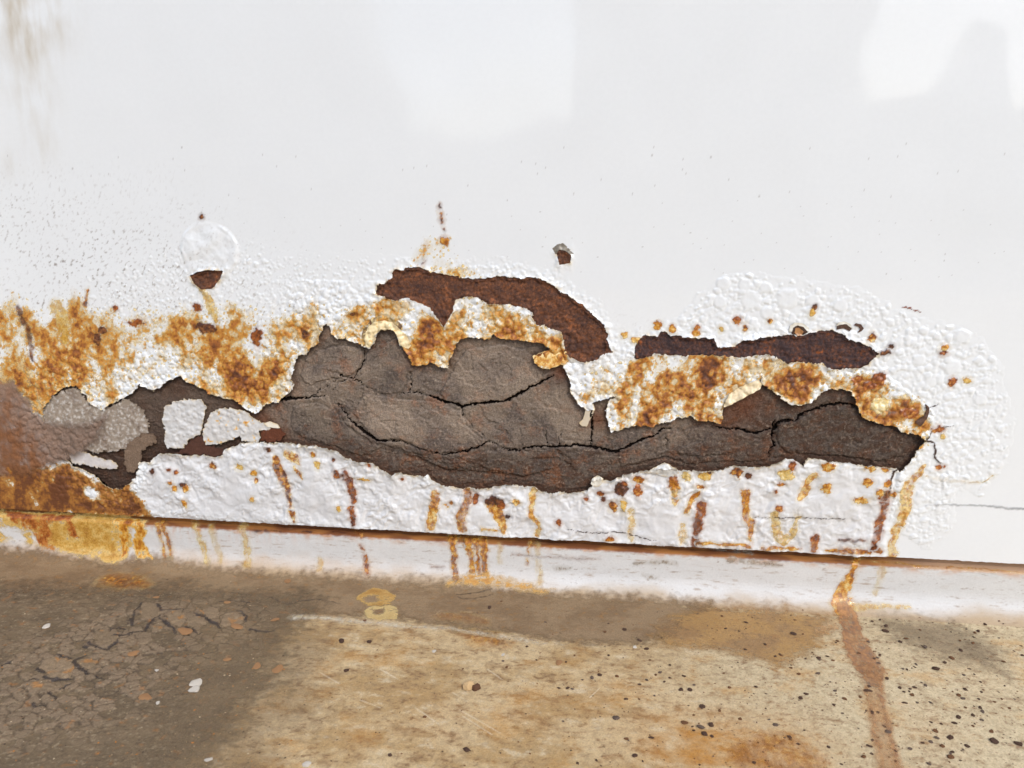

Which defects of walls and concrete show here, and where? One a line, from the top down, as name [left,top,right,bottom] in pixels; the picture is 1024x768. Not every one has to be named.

rust [0,463,171,585]
rust [149,468,189,508]
rust [0,288,568,415]
rust [266,447,371,574]
crack [272,347,671,456]
peeling [42,267,929,494]
rust [426,487,546,593]
rust [583,476,645,527]
rust [579,355,946,449]
crack [716,402,853,457]
crack [926,405,954,462]
rust [668,461,946,768]